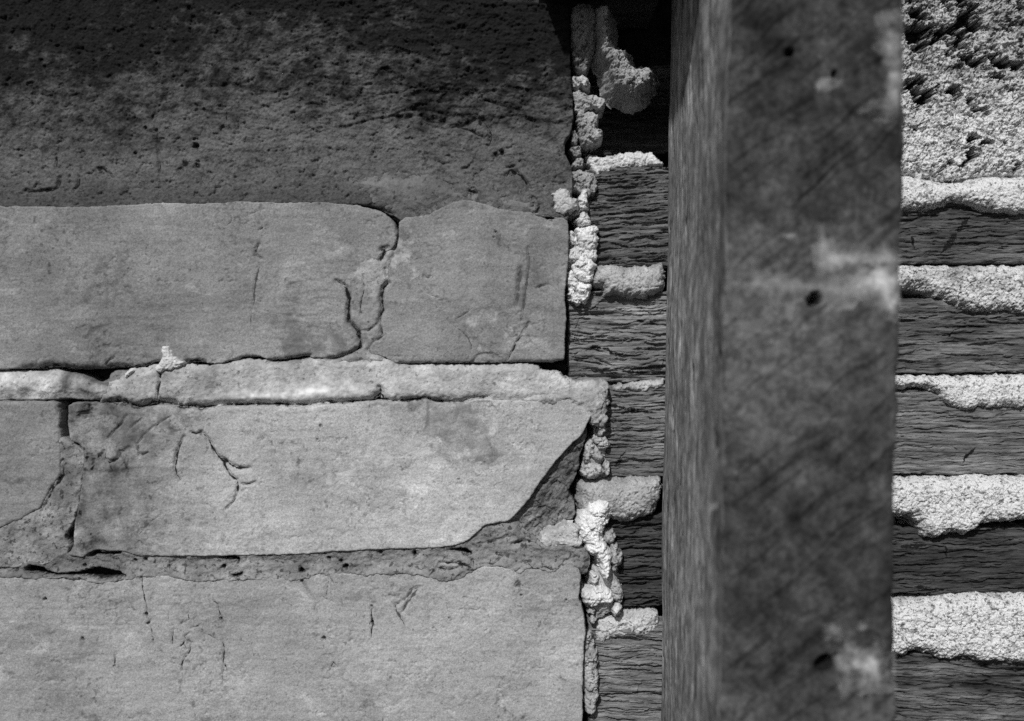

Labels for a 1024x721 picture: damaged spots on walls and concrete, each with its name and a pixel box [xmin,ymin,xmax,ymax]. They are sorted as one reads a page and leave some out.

crack [336,209,399,358]
crack [32,358,485,508]
spalling [509,427,587,536]